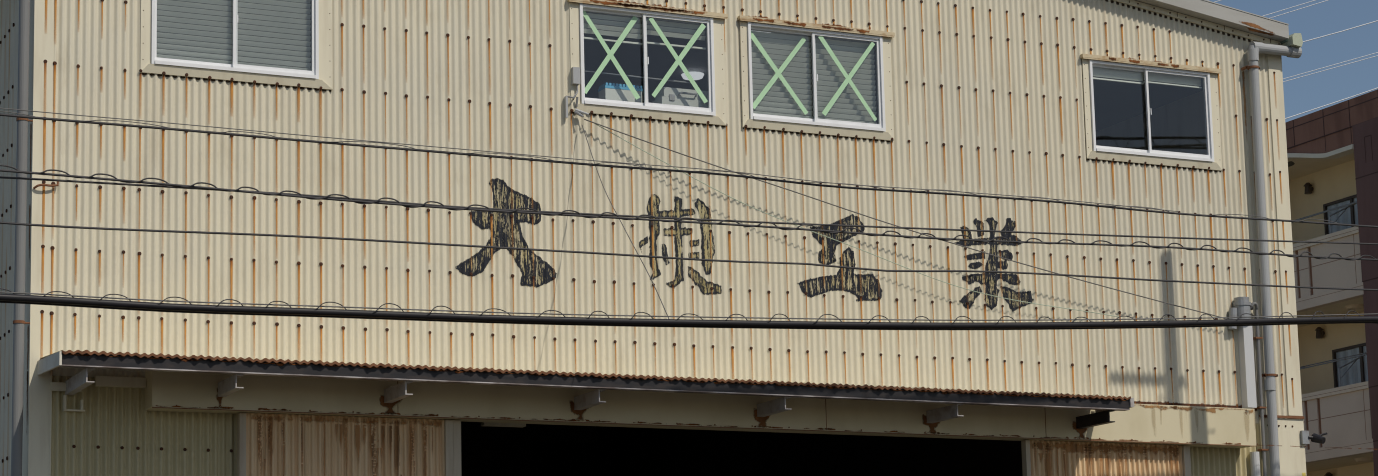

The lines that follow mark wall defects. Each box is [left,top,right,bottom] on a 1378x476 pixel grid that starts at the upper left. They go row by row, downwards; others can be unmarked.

corrosion [590,0,705,14]
corrosion [742,0,1278,156]
corrosion [29,63,56,291]
corrosion [123,127,141,174]
corrosion [27,313,53,404]
corrosion [144,320,198,361]
corrosion [256,326,344,367]
corrosion [493,336,576,377]
corrosion [658,233,864,389]
corrosion [745,128,1282,413]
corrosion [252,395,515,476]
corrosion [922,414,1196,476]